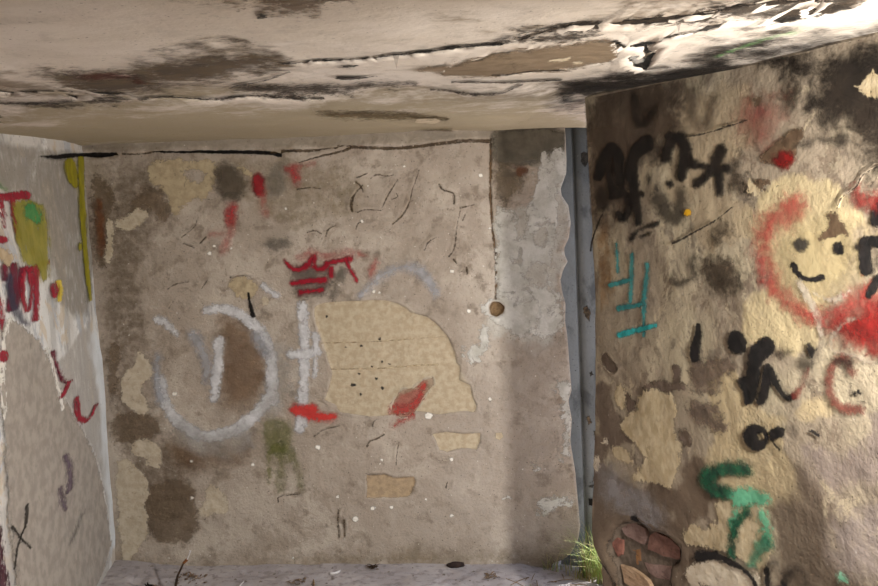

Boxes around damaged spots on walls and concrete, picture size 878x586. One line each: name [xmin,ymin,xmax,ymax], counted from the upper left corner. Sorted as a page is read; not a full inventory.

damp [230,0,351,18]
crack [0,0,876,123]
crack [683,120,747,137]
crack [33,133,500,300]
spalling [310,147,565,461]
damp [105,343,122,395]
damp [109,413,160,444]
peeling [551,380,571,463]
peeling [586,350,736,489]
damp [144,479,199,543]
peeling [536,495,574,516]
spalling [596,489,777,586]